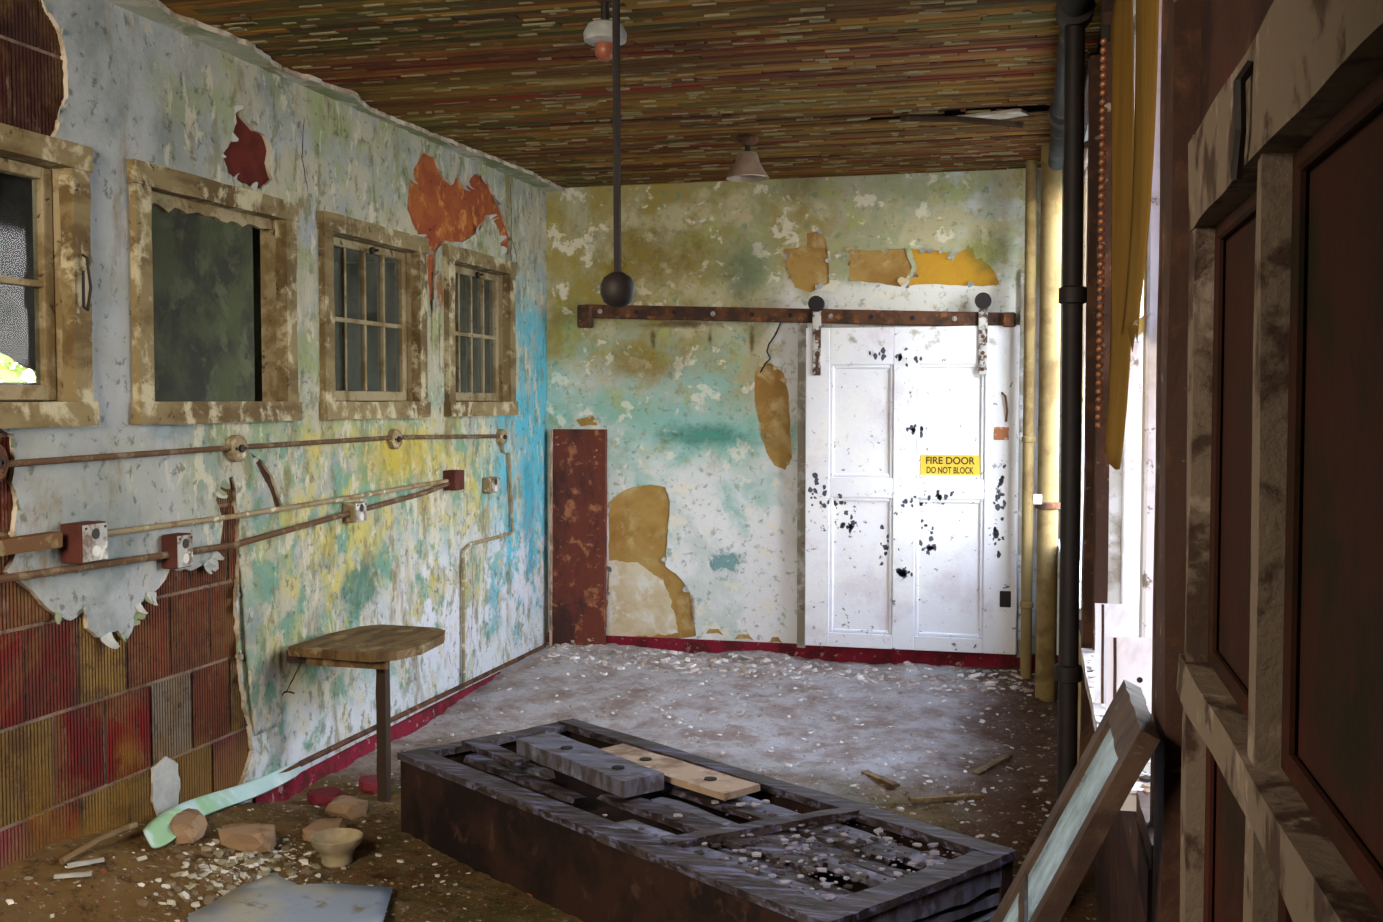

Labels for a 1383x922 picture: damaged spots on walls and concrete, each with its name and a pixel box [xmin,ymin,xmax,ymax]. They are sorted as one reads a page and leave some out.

spalling [0,0,68,136]
spalling [221,105,271,192]
spalling [407,153,510,310]
peeling [783,228,830,292]
peeling [846,247,999,288]
spalling [0,432,21,539]
peeling [606,485,753,641]
peeling [808,473,861,533]
peeling [880,525,913,578]
peeling [901,490,954,555]
peeling [989,464,1006,558]
spalling [0,476,250,870]